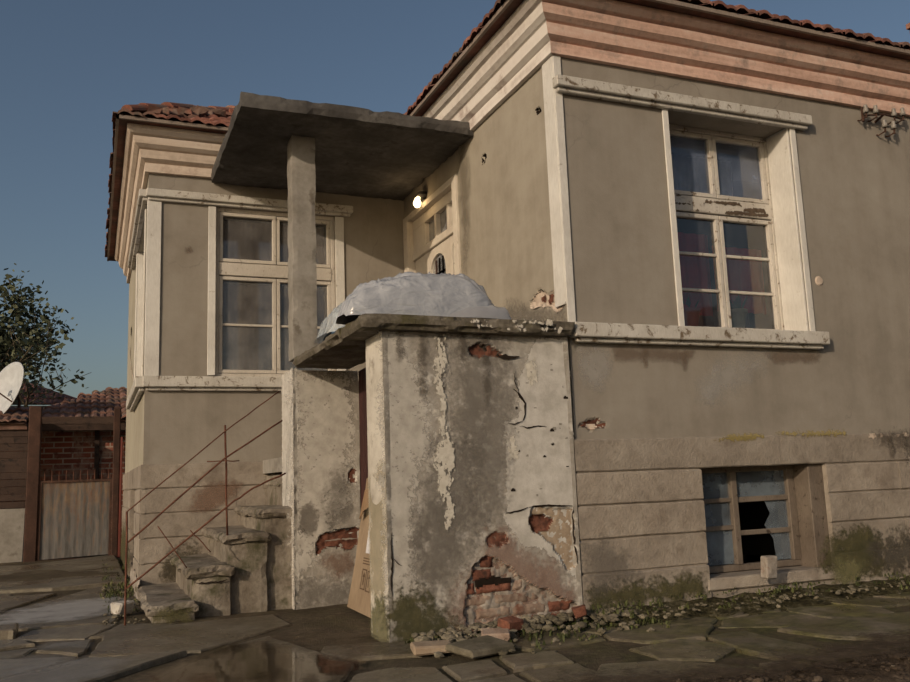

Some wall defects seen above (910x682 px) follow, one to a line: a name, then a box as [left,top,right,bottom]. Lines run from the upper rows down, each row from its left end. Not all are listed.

peeling [286,369,359,579]
peeling [377,331,456,618]
crack [509,372,546,429]
peeling [464,336,606,642]
spalling [530,289,565,313]
peeling [675,194,769,217]